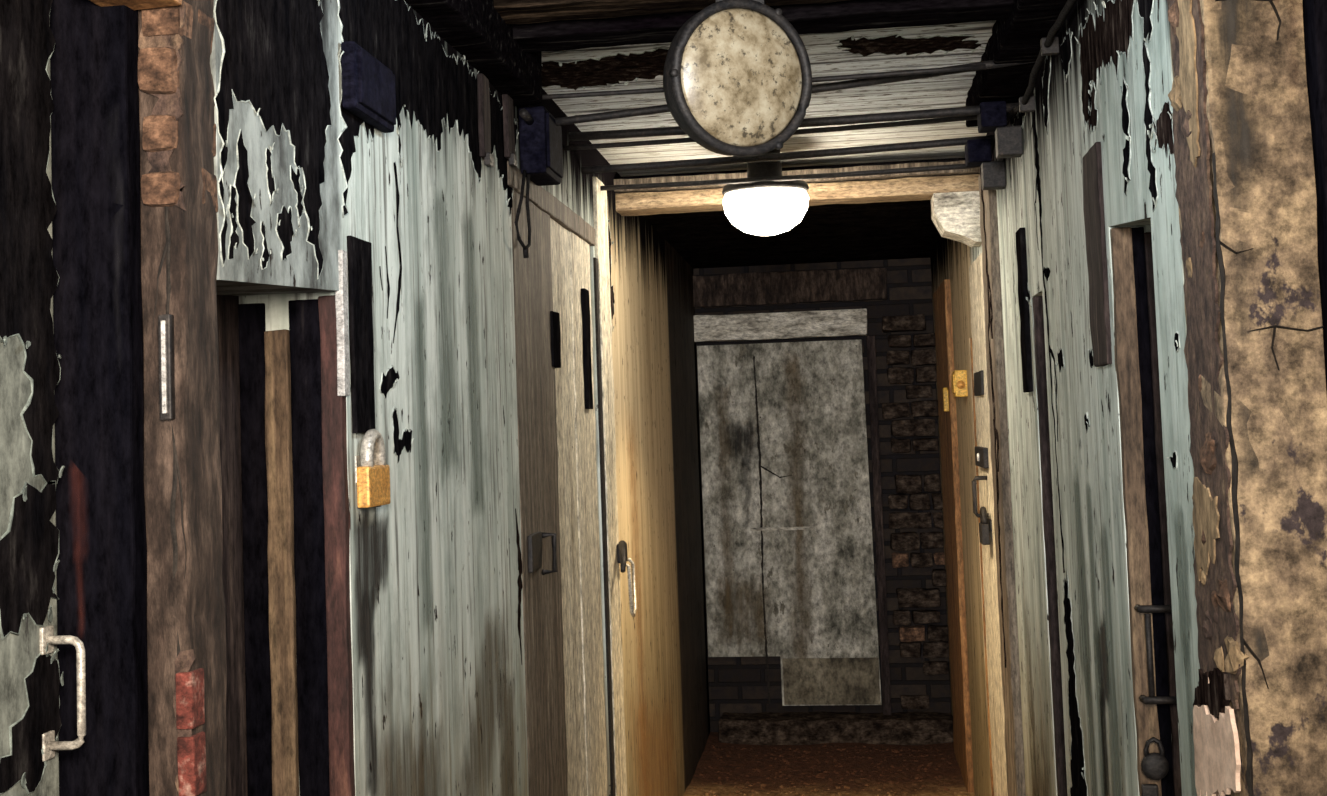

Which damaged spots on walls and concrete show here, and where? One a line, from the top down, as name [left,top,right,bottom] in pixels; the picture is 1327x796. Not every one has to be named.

peeling [0,643,64,795]
peeling [0,0,65,641]
peeling [138,0,519,279]
spalling [1042,0,1249,718]
crack [1212,153,1323,796]